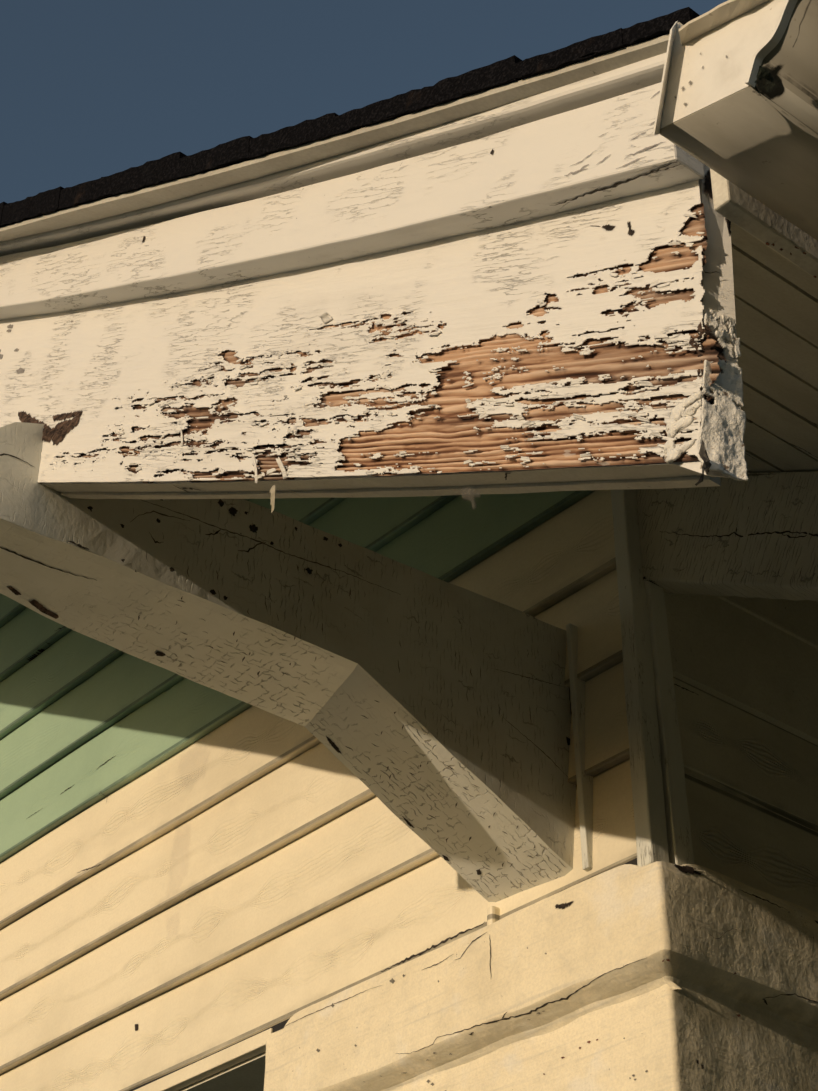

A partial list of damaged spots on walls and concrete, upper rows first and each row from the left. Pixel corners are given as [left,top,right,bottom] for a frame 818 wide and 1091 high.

crack [550,162,680,206]
peeling [56,203,749,483]
crack [660,528,818,538]
crack [0,547,95,580]
crack [423,934,491,973]
crack [396,959,643,1054]